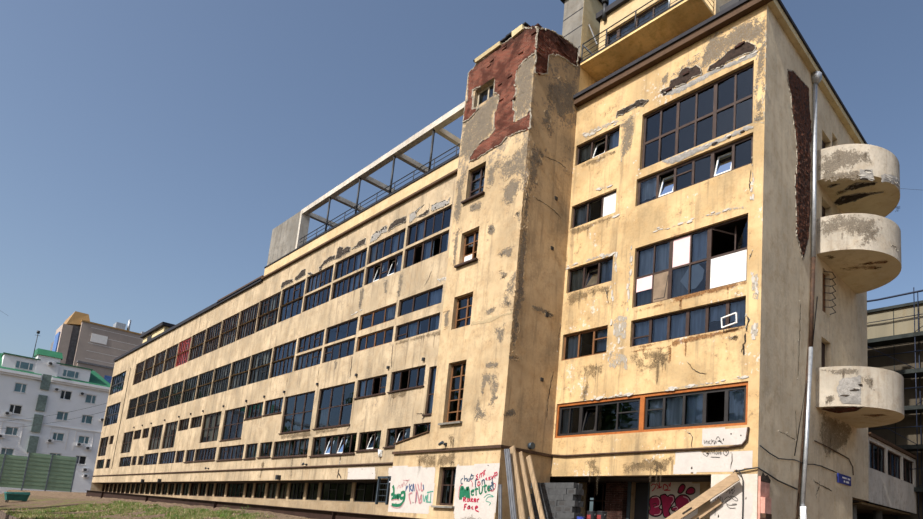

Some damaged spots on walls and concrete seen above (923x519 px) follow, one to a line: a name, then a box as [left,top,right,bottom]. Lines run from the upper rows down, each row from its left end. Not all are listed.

spalling [281,26,579,361]
peeling [583,99,649,163]
peeling [660,17,767,164]
spalling [787,69,900,260]
peeling [566,252,618,272]
peeling [608,246,633,370]
spalling [821,368,875,413]